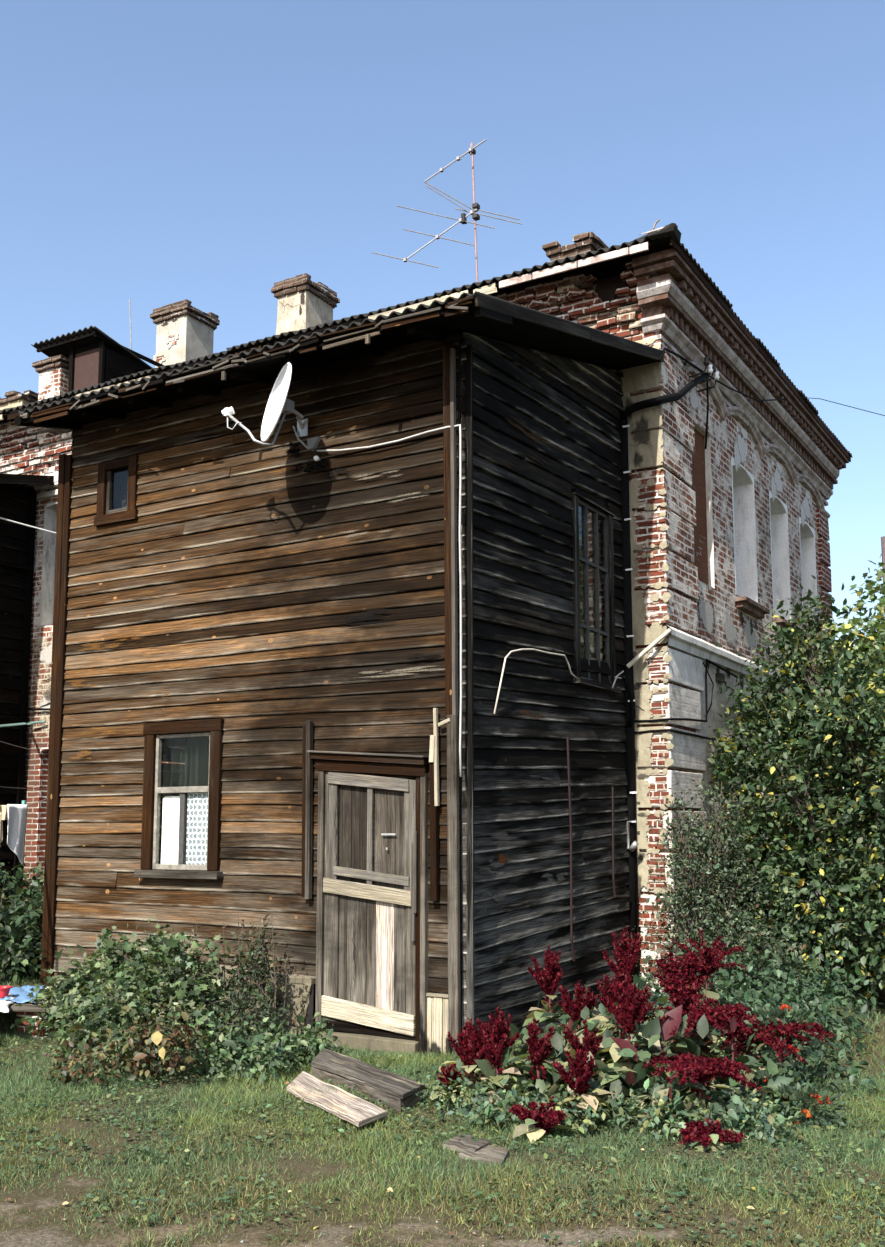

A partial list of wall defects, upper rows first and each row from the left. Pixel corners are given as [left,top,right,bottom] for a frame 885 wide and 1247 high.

spalling [607,269,634,312]
leakage [285,442,399,480]
flaking render [634,479,671,627]
flaking render [39,641,52,665]
flaking render [645,652,673,719]
flaking render [638,732,674,973]